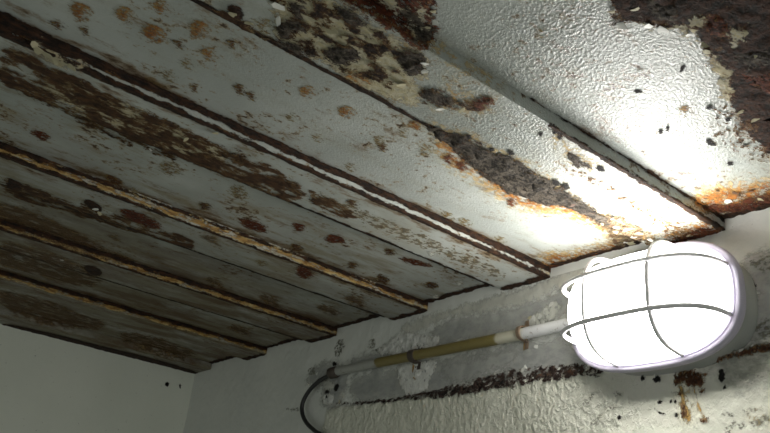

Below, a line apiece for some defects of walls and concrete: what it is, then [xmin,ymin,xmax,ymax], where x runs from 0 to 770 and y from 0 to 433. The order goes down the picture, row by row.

rust [0,0,641,374]
rust [530,98,770,243]
spalling [307,361,348,409]
peeling [395,359,437,396]
rust [674,369,709,423]